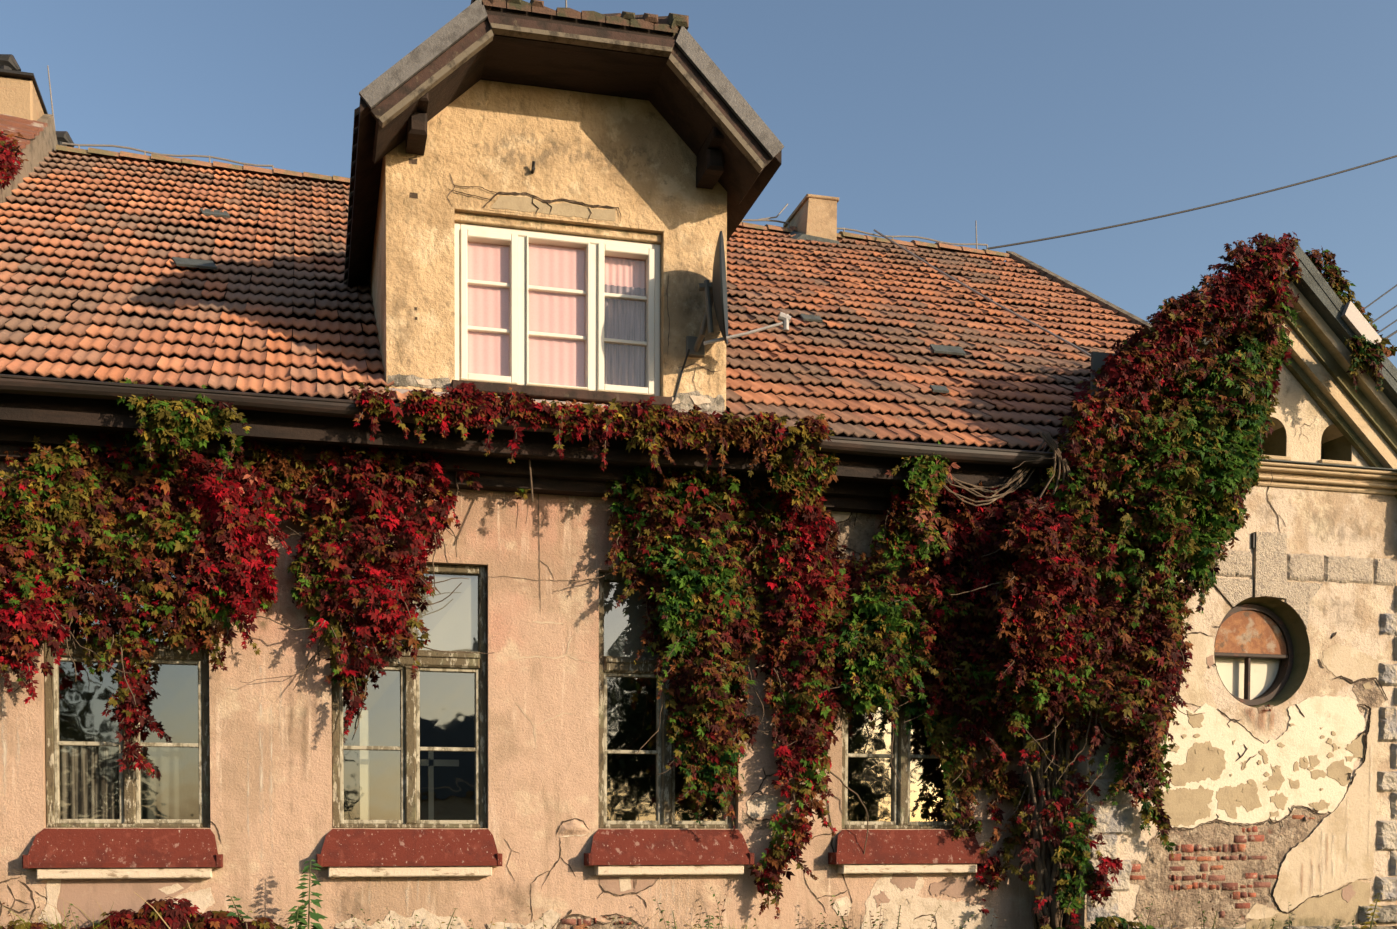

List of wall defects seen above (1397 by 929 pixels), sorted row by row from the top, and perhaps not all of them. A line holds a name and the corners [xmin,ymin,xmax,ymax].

crack [447,174,621,224]
crack [1318,632,1388,785]
crack [1217,709,1262,770]
peeling [1129,633,1387,929]
peeling [335,908,468,929]
flaking render [487,909,637,929]
crack [503,838,658,929]
peeling [599,876,660,894]
peeling [832,873,998,929]
crack [1170,805,1352,914]